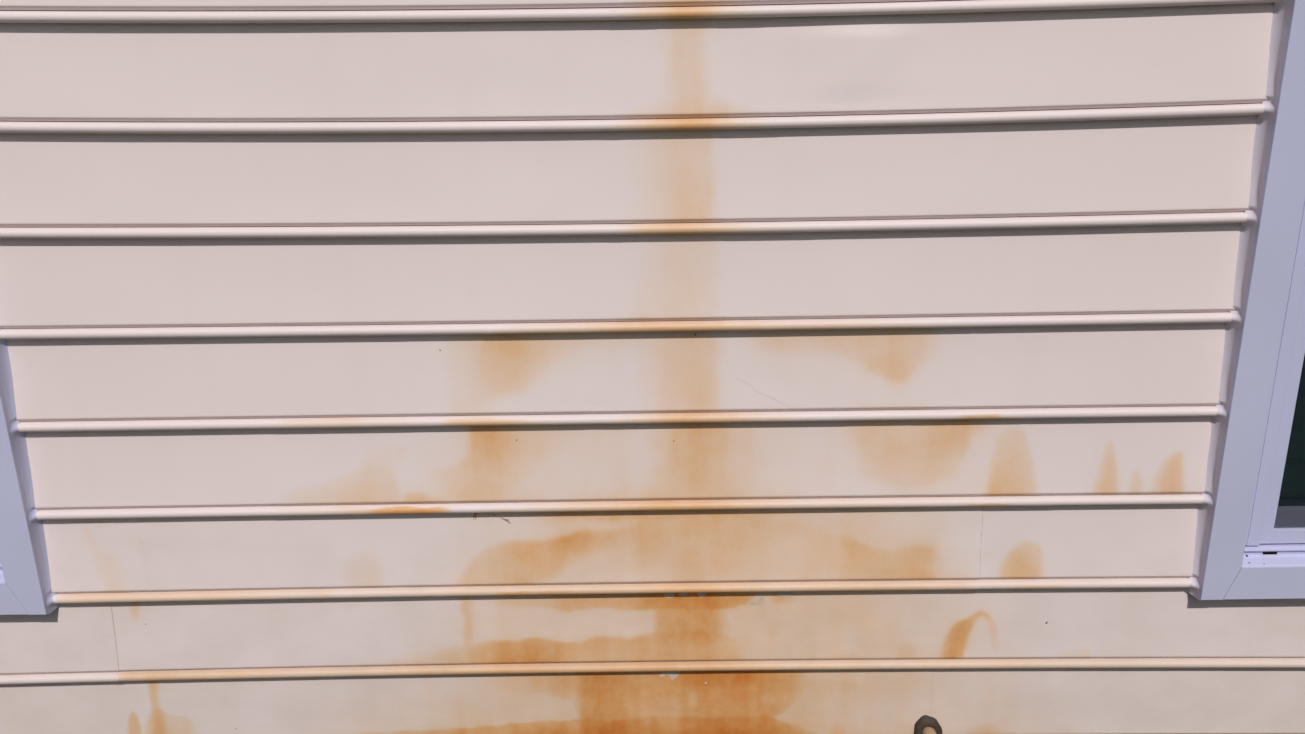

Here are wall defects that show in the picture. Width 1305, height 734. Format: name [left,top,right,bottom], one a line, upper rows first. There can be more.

corrosion [269,0,1057,516]
corrosion [1084,436,1193,495]
corrosion [108,507,1305,734]